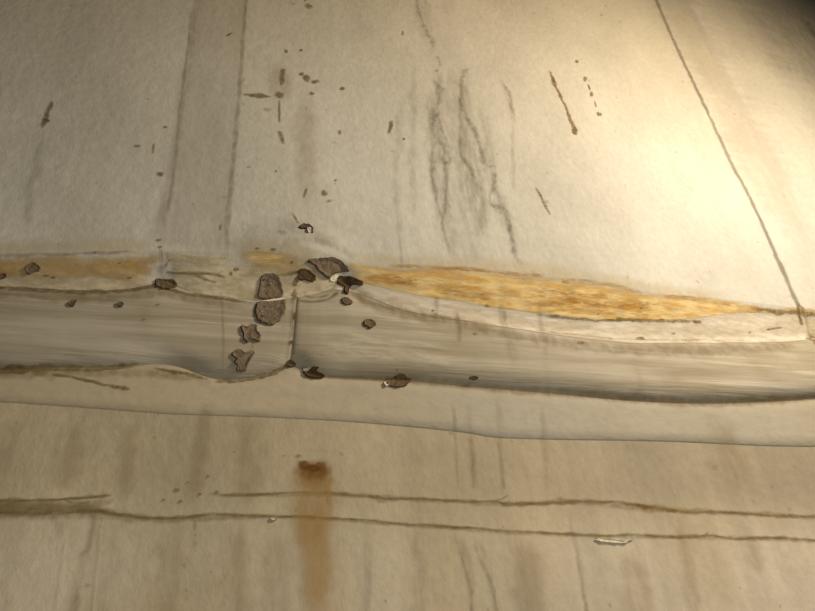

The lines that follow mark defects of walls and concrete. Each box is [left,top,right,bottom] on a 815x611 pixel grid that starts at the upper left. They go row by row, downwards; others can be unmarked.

corrosion [245,69,285,121]
peeling [0,257,815,447]
corrosion [297,455,326,484]
crack [529,531,651,544]